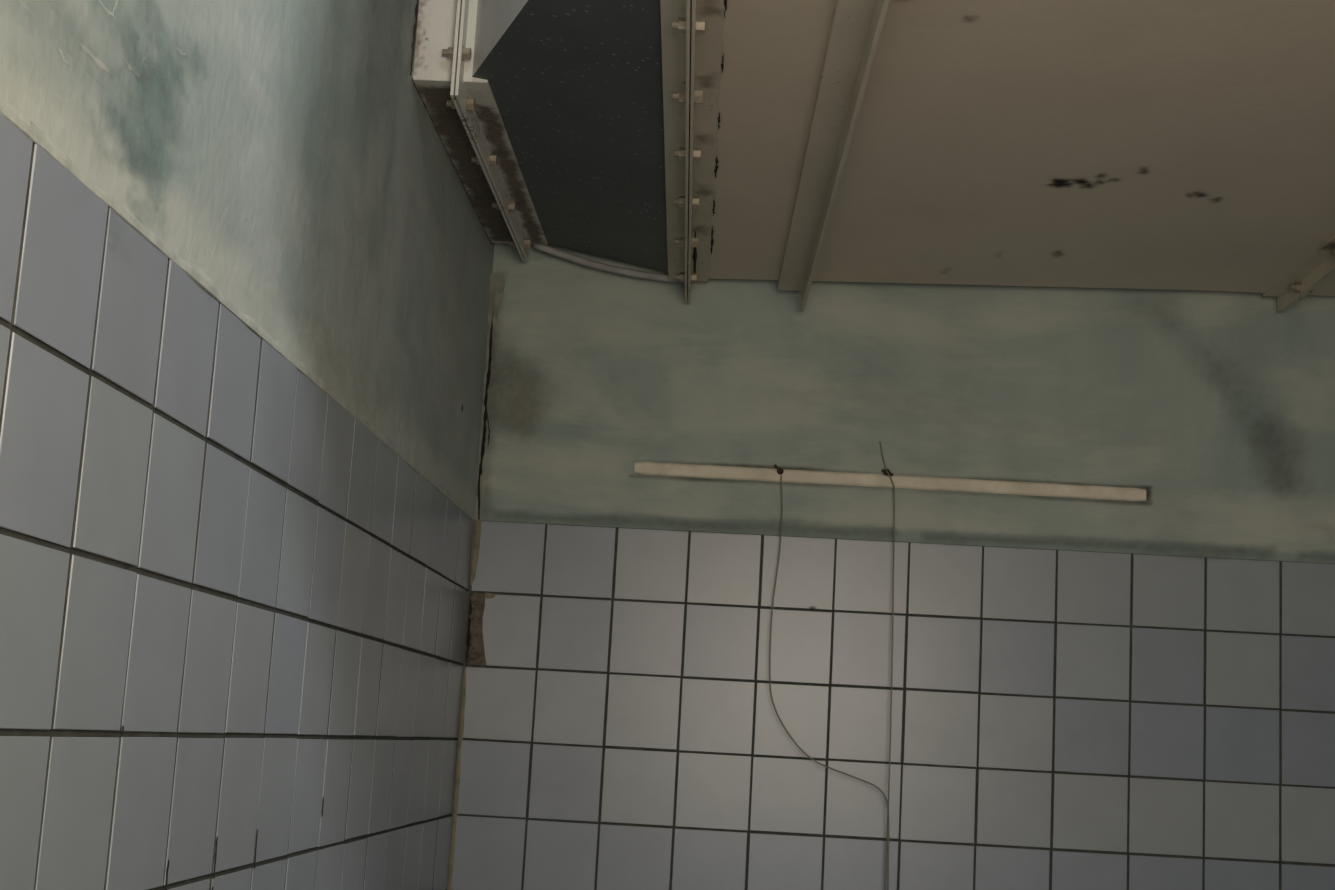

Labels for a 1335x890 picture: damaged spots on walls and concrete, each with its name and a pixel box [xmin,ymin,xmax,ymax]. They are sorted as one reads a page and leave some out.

spalling [466,593,496,665]